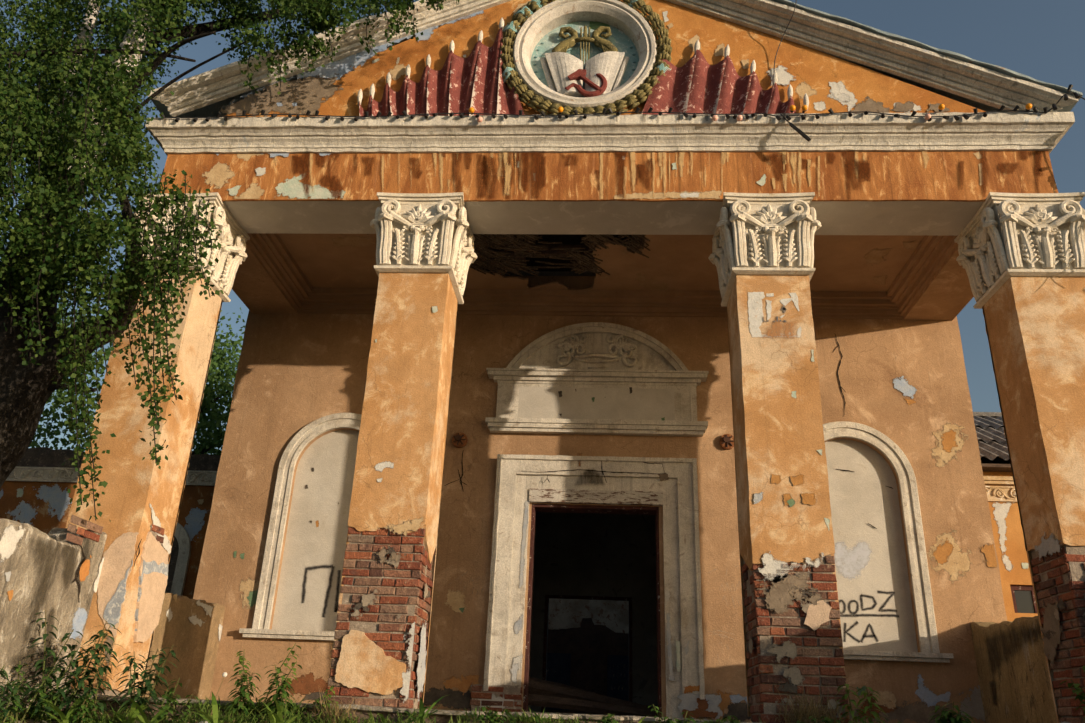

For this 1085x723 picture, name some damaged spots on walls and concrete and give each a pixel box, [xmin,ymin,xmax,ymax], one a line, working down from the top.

peeling [212,10,484,117]
peeling [766,64,950,113]
peeling [202,153,346,199]
water stain [491,152,522,195]
water stain [623,152,729,198]
water stain [772,152,820,196]
crack [832,334,846,414]
peeling [0,483,104,601]
flaking render [149,504,172,554]
flaking render [303,517,523,712]
flaking render [665,551,896,723]
flaking render [927,502,1085,723]